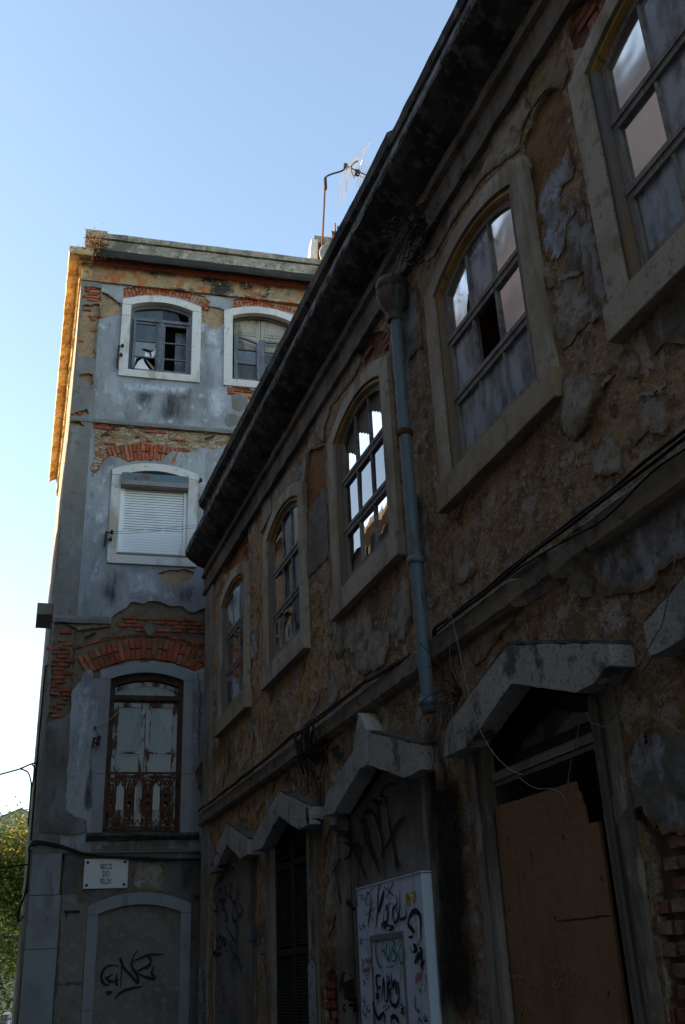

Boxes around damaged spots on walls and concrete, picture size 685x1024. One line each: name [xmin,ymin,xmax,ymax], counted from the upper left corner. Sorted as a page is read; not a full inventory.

peeling [413,0,608,350]
spalling [77,286,298,359]
spalling [79,373,94,389]
spalling [70,387,255,477]
spalling [158,569,194,584]
spalling [39,601,206,835]
peeling [625,726,685,1024]